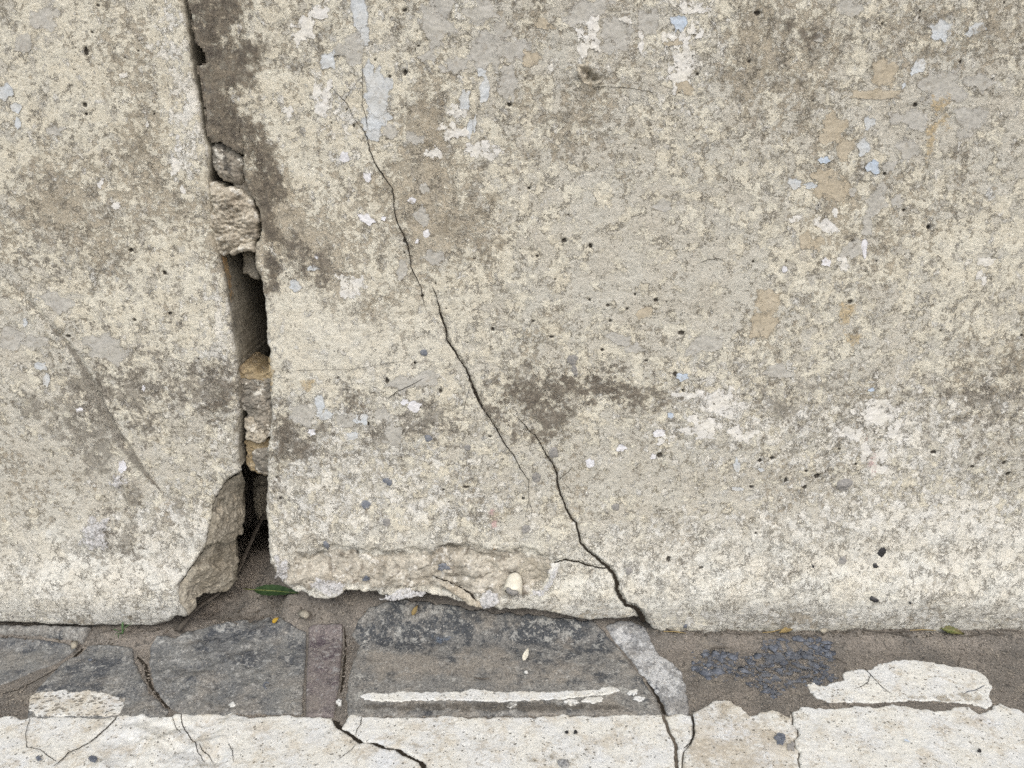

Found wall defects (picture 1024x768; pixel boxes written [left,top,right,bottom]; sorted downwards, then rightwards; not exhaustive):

peeling [290,4,330,48]
peeling [312,0,542,161]
peeling [535,0,712,97]
peeling [902,57,926,89]
peeling [927,18,953,42]
peeling [964,22,987,37]
peeling [357,213,386,226]
peeling [407,182,445,266]
peeling [787,109,904,271]
crack [331,68,645,622]
spalling [179,415,268,616]
spalling [274,543,559,608]